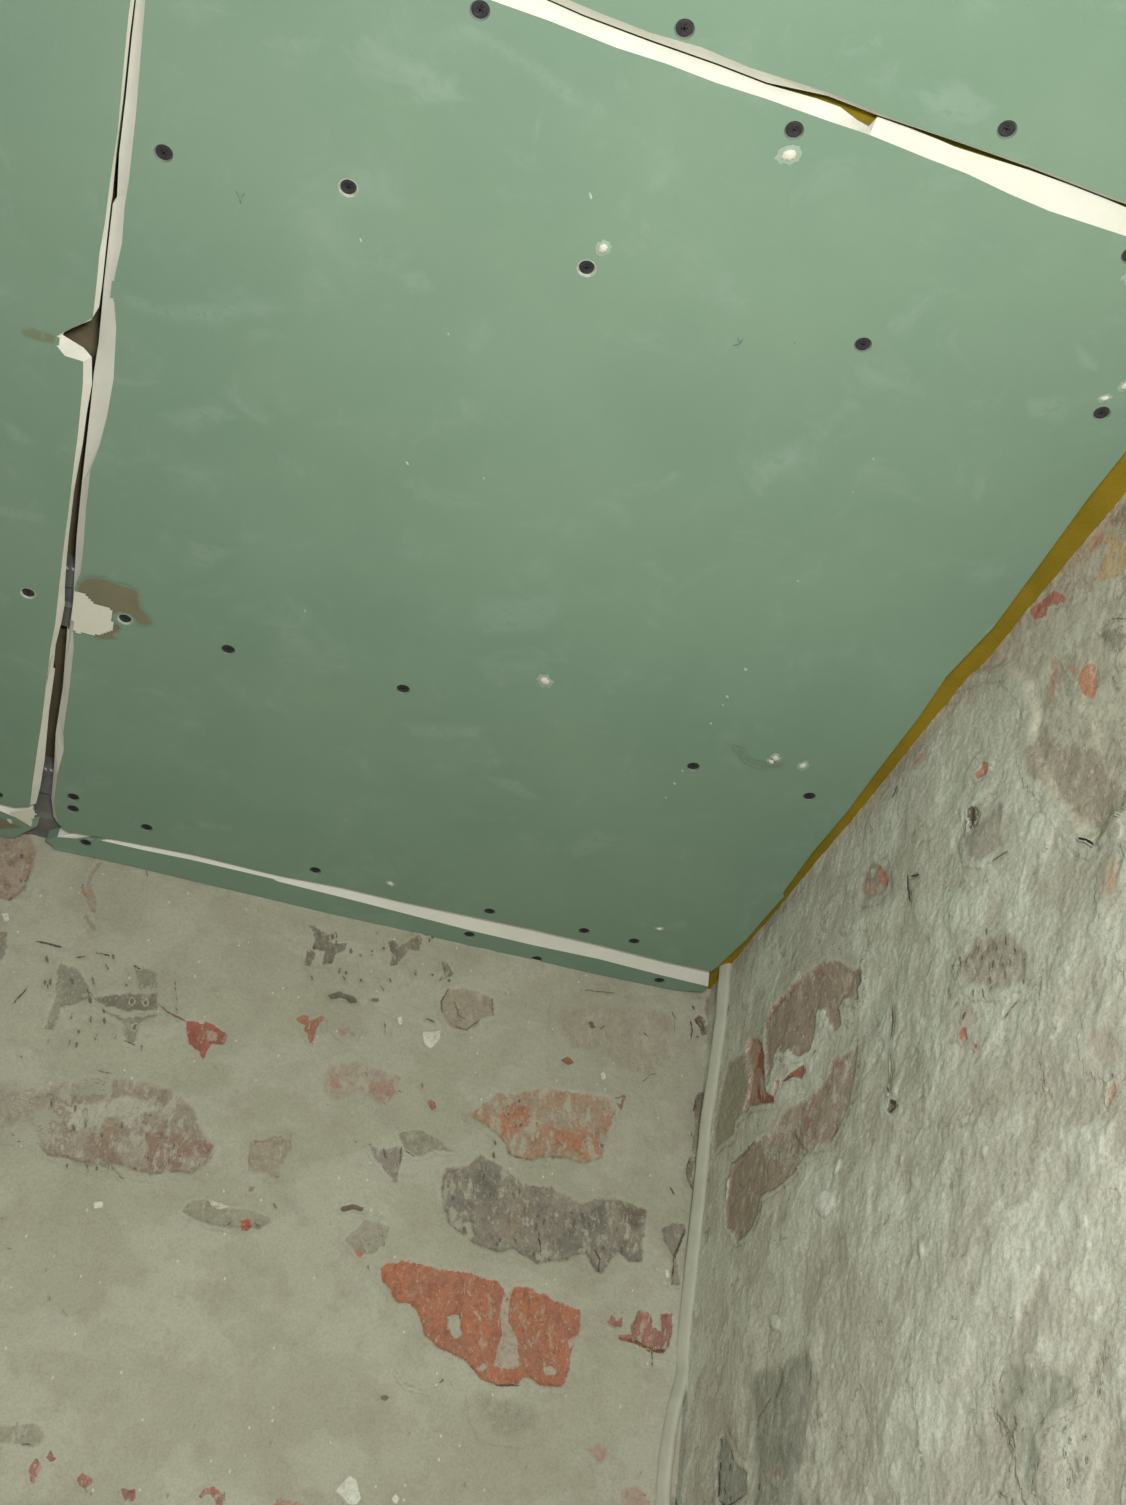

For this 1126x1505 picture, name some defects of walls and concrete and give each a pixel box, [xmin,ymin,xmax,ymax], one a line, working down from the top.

spalling [956,493,1126,870]
crack [1077,796,1126,846]
flaking render [0,834,44,966]
spalling [13,940,233,1070]
flaking render [6,1068,299,1234]
spalling [560,1055,576,1067]
flaking render [669,954,864,1248]
flaking render [337,1070,690,1395]
flaking render [73,1470,96,1496]
flaking render [117,1484,139,1505]
flaking render [194,1483,228,1505]
flaking render [334,1475,363,1505]